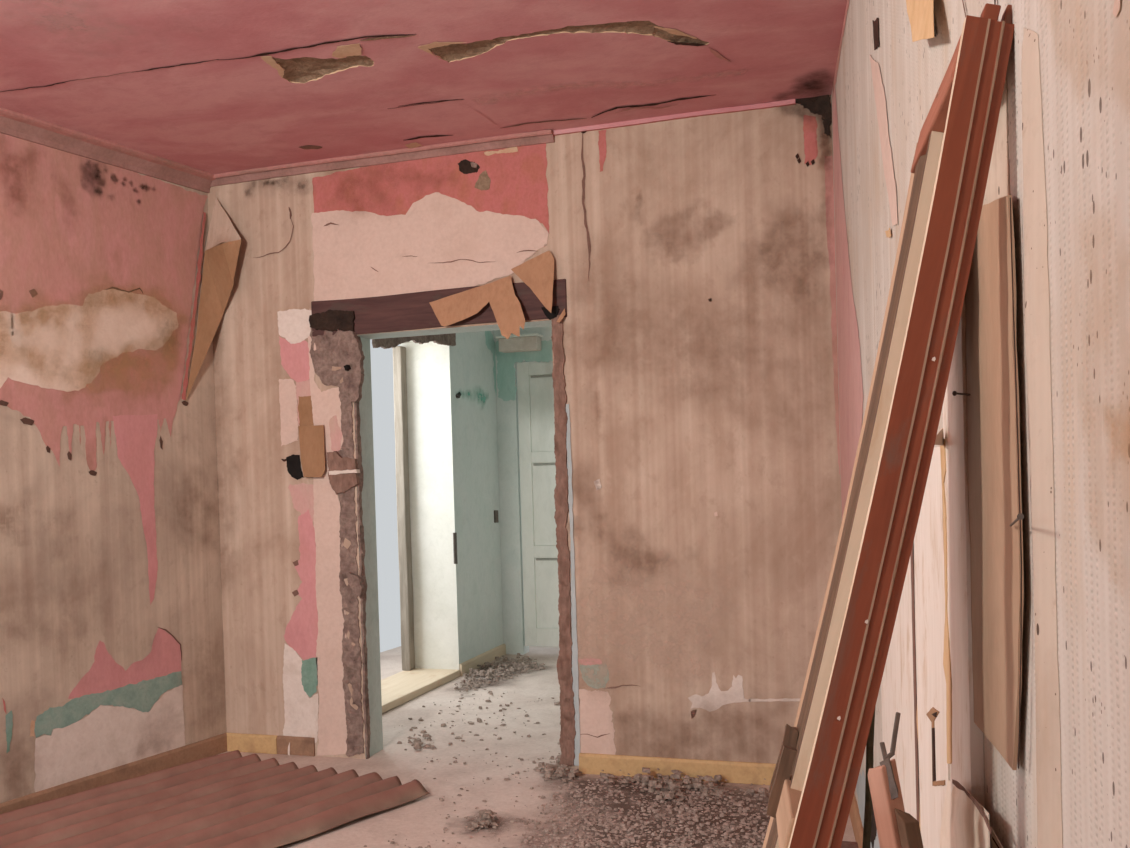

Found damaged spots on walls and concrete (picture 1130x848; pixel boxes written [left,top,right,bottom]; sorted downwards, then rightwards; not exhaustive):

crack [1,34,416,92]
spalling [418,21,730,62]
crack [389,99,462,109]
crack [406,135,452,149]
water stain [795,80,832,145]
water stain [85,165,148,203]
crack [503,95,713,279]
crack [403,255,485,263]
peeling [0,133,208,606]
flaking render [277,143,549,759]
flaking render [551,315,638,767]
flaking render [30,627,185,792]